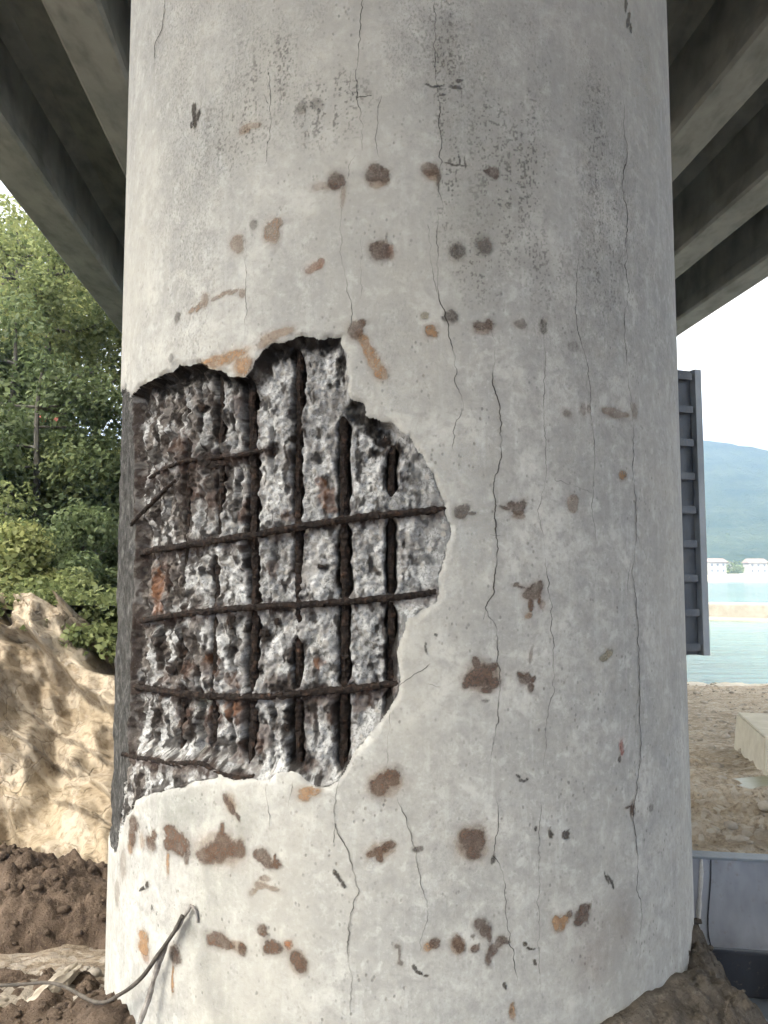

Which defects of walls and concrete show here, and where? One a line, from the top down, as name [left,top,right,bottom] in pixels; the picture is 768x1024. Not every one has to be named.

corrosion [328,173,346,190]
corrosion [365,164,390,182]
corrosion [348,319,387,379]
crack [483,373,502,727]
spalling [110,336,451,852]
corrosion [513,580,543,618]
corrosion [462,656,499,693]
crack [627,568,642,912]
corrosion [370,769,400,796]
corrosion [128,794,281,893]
corrosion [459,829,485,859]
crack [333,823,359,953]